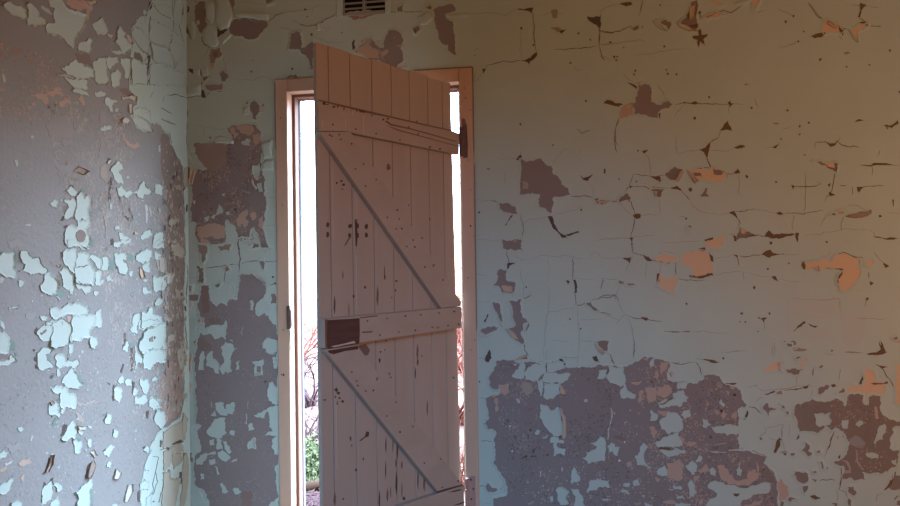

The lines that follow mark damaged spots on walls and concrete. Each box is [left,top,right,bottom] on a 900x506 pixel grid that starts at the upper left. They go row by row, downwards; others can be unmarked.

peeling [350,1,459,68]
peeling [631,70,685,121]
peeling [497,155,573,217]
crack [385,0,898,365]
peeling [0,0,284,506]
peeling [654,247,717,296]
peeling [801,250,864,294]
peeling [474,266,900,506]